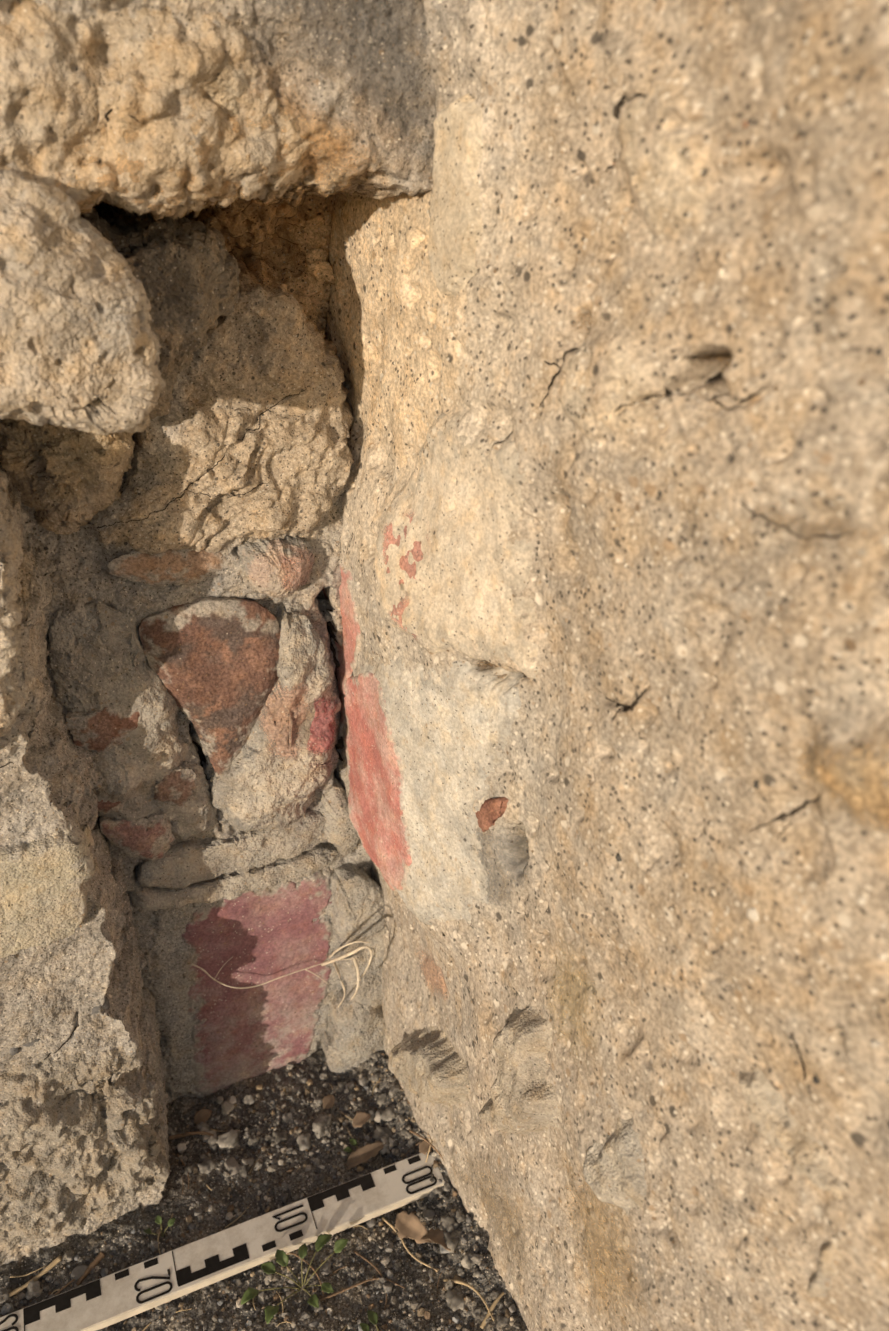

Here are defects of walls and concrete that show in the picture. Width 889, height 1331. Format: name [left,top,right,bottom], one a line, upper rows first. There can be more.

crack [614,372,769,412]
peeling [323,413,539,925]